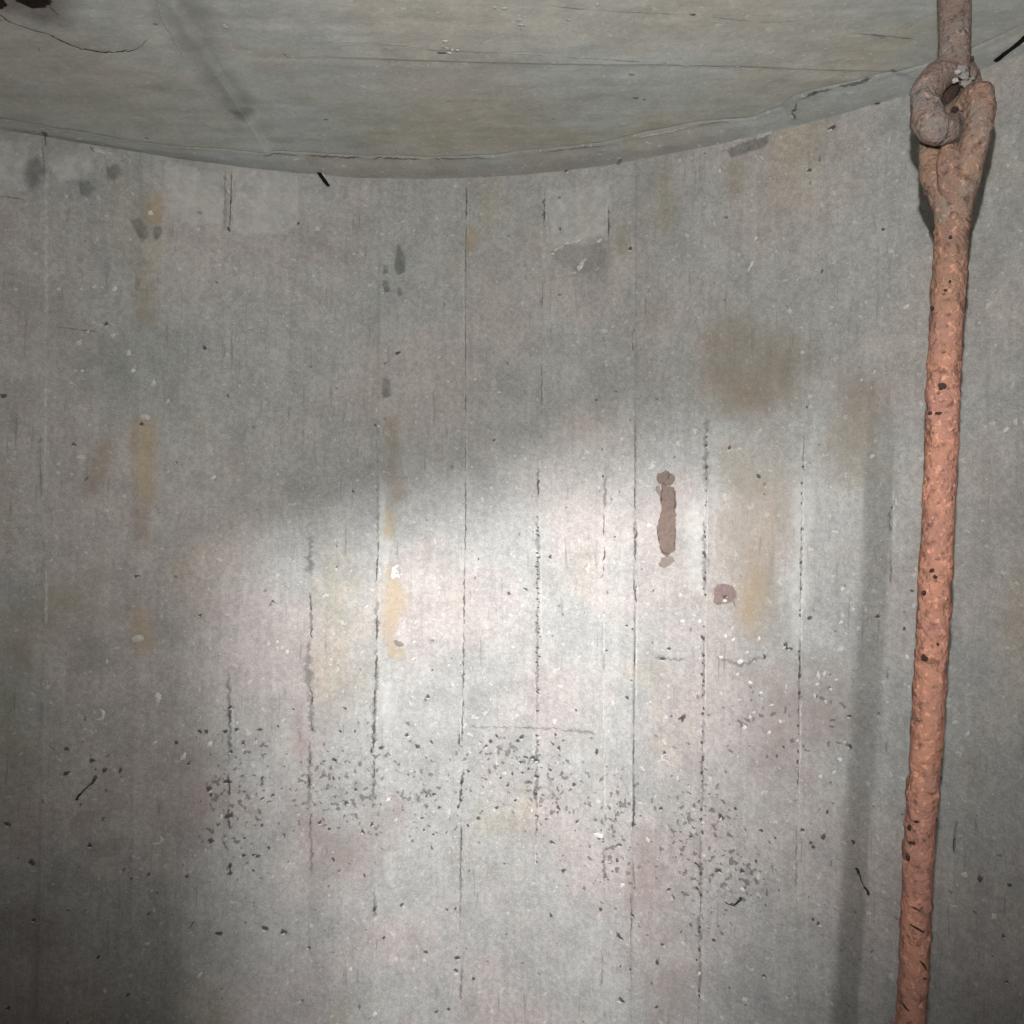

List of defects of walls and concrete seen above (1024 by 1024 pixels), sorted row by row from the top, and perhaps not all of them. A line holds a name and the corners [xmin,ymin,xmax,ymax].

crack [0,15,138,53]
corrosion [713,584,736,607]